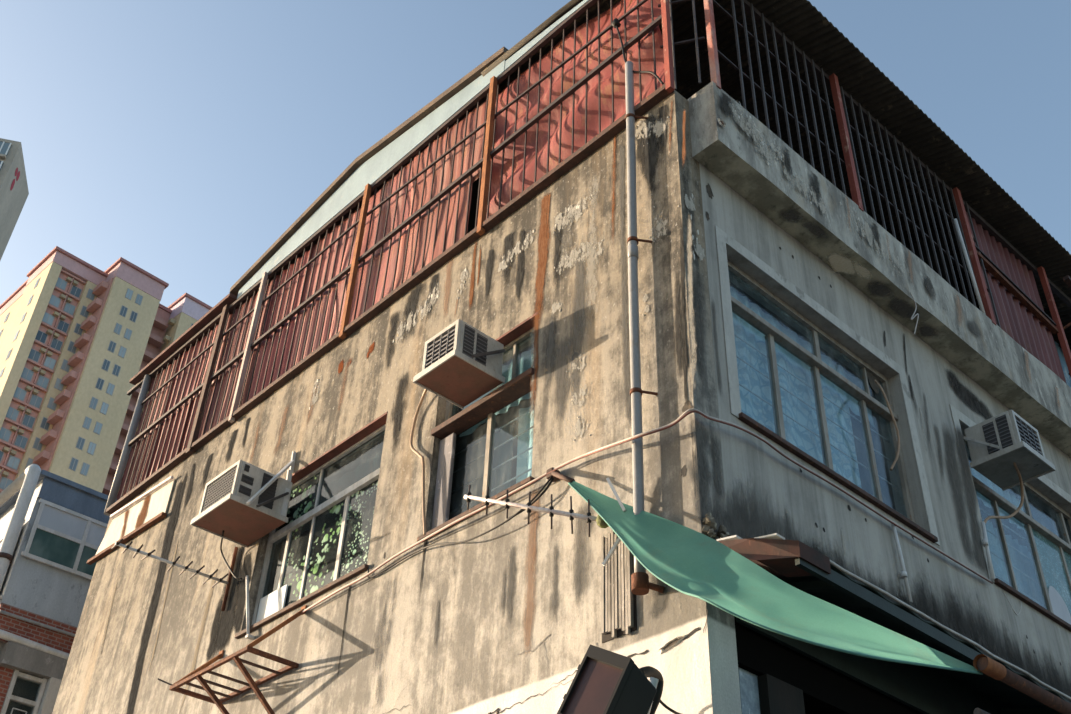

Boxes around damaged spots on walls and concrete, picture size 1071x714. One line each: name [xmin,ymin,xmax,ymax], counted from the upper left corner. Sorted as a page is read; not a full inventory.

peeling [393,284,440,344]
leakage [485,230,524,299]
rust [530,193,551,406]
peeling [554,195,593,233]
peeling [554,239,604,274]
leakage [619,105,668,421]
leakage [674,221,722,404]
leakage [691,425,797,540]
leakage [126,454,213,714]
leakage [181,546,251,706]
rust [525,492,538,648]
crack [490,634,578,714]